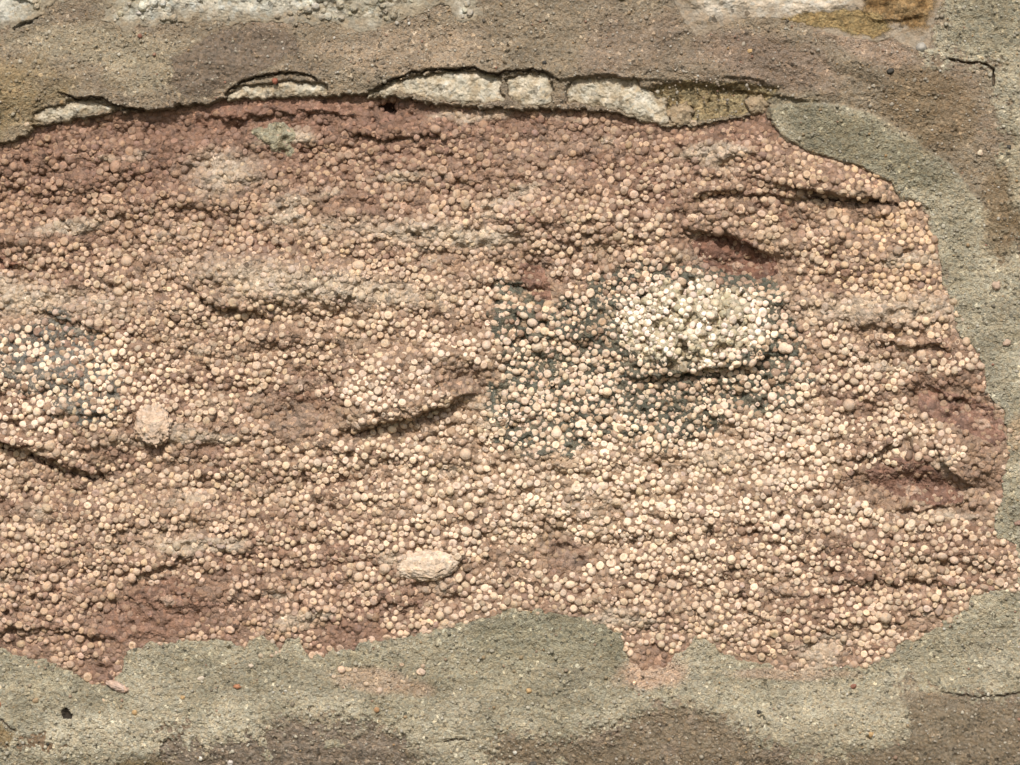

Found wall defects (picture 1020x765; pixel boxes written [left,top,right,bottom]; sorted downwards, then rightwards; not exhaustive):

peeling [33,100,116,125]
peeling [193,69,553,130]
crack [370,66,553,91]
peeling [566,77,695,127]
peeling [744,94,770,115]
crack [949,58,995,85]
spalling [691,234,779,280]
spalling [519,262,552,301]
spalling [917,387,1006,447]
spalling [864,456,964,507]
spalling [546,536,590,572]
spalling [97,576,211,645]